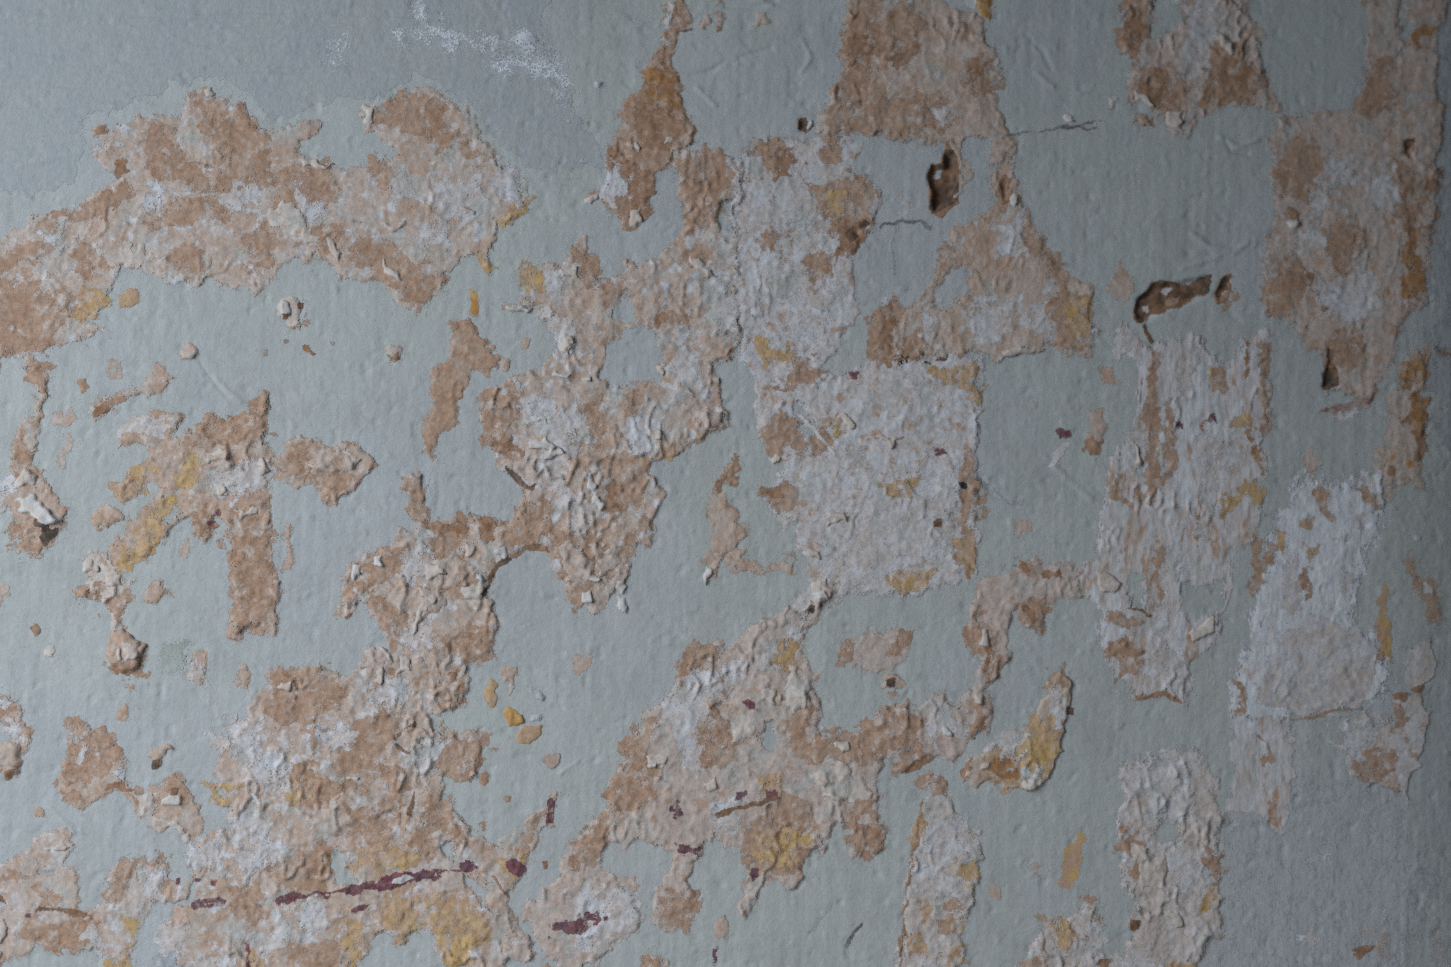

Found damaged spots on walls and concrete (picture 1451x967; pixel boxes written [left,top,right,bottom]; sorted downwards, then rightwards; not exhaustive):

peeling [0,0,1101,967]
peeling [521,320,1444,967]
peeling [1113,0,1450,404]